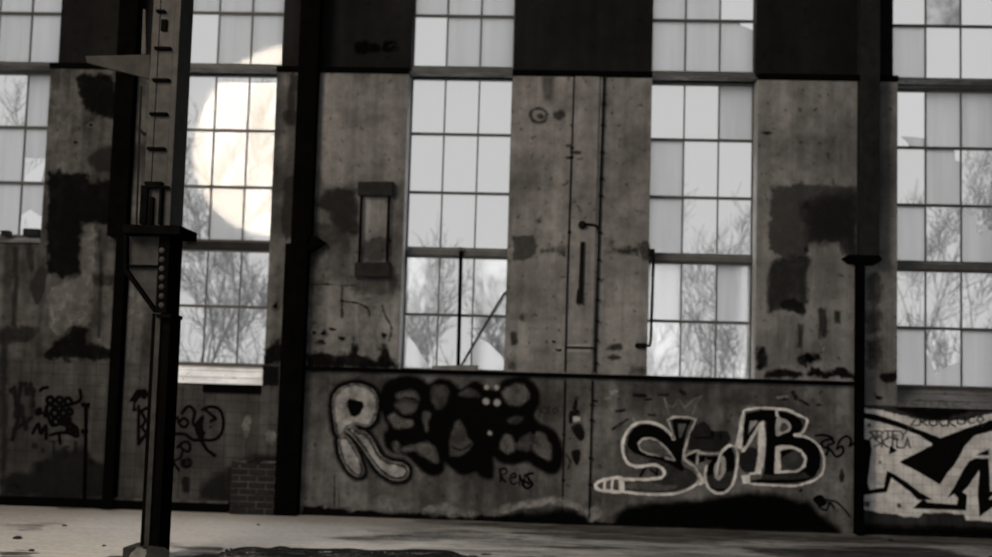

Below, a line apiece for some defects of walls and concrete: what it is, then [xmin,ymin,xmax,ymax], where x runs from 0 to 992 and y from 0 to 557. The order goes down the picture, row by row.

water stain [76,73,115,119]
water stain [0,146,114,509]
water stain [756,184,857,379]